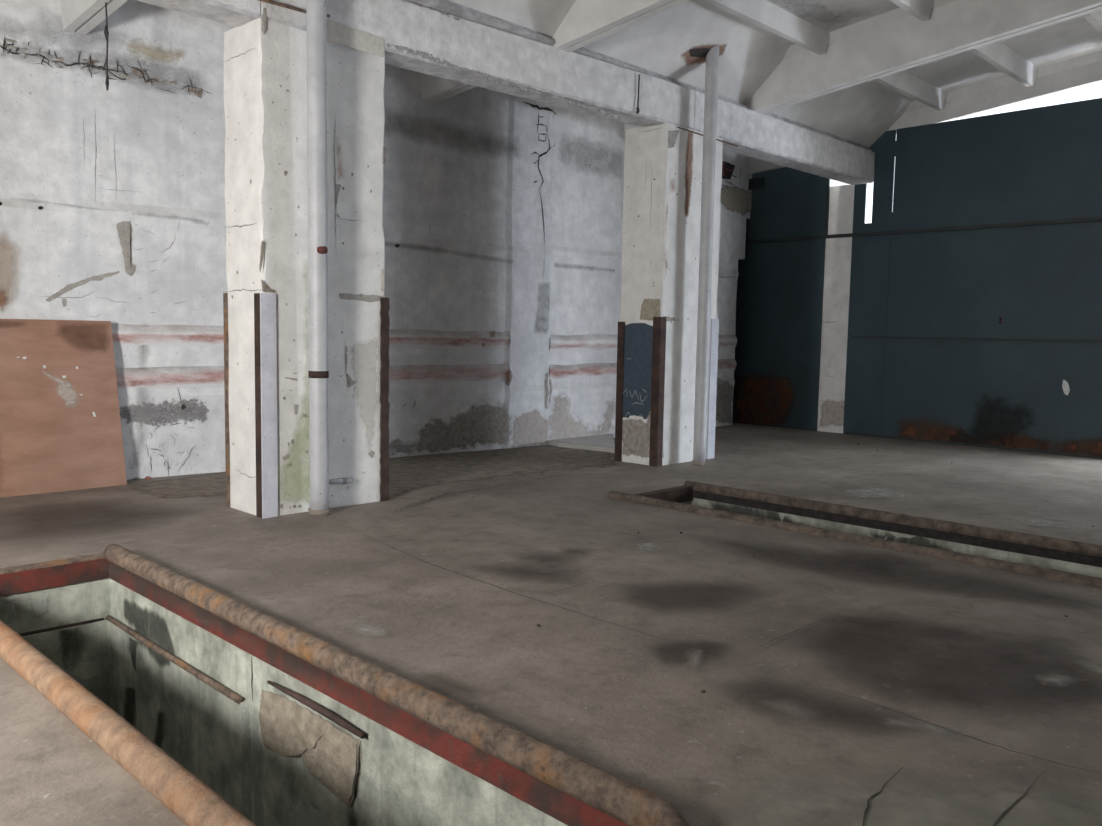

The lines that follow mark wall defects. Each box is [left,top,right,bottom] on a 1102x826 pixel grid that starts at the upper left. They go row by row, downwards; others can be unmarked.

spalling [0,37,212,98]
crack [524,102,557,278]
spalling [721,161,752,215]
peeling [117,221,136,276]
peeling [341,331,376,457]
peeling [389,373,650,457]
rust [734,375,794,425]
peeling [820,401,844,426]
rust [900,420,1102,455]
crack [863,767,903,826]